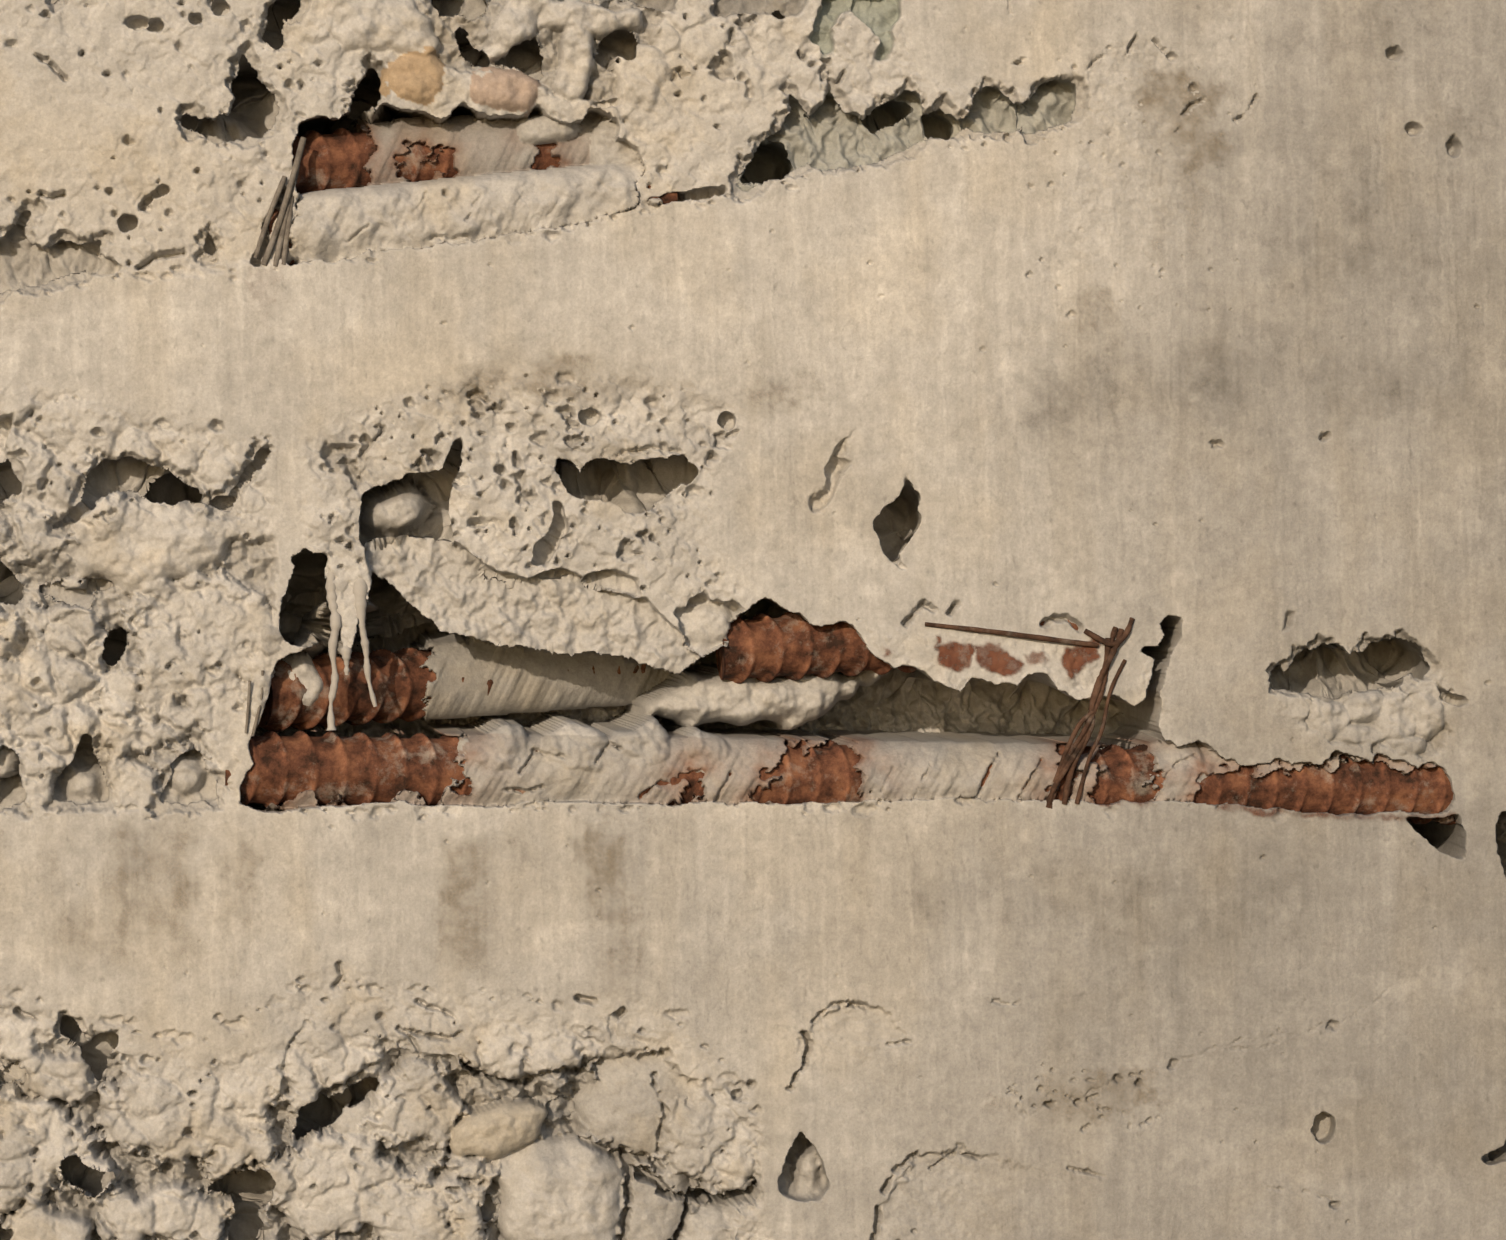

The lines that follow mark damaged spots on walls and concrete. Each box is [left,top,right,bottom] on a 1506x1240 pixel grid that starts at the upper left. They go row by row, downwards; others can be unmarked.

spalling [262,0,302,53]
spalling [432,0,547,82]
spalling [710,0,903,63]
spalling [180,51,280,145]
spalling [269,68,391,234]
peeling [735,30,1209,329]
spalling [51,357,1479,860]
corrosion [935,637,1043,676]
corrosion [1062,639,1100,679]
spalling [288,1075,380,1142]
spalling [203,1164,276,1240]
spalling [778,1130,830,1202]